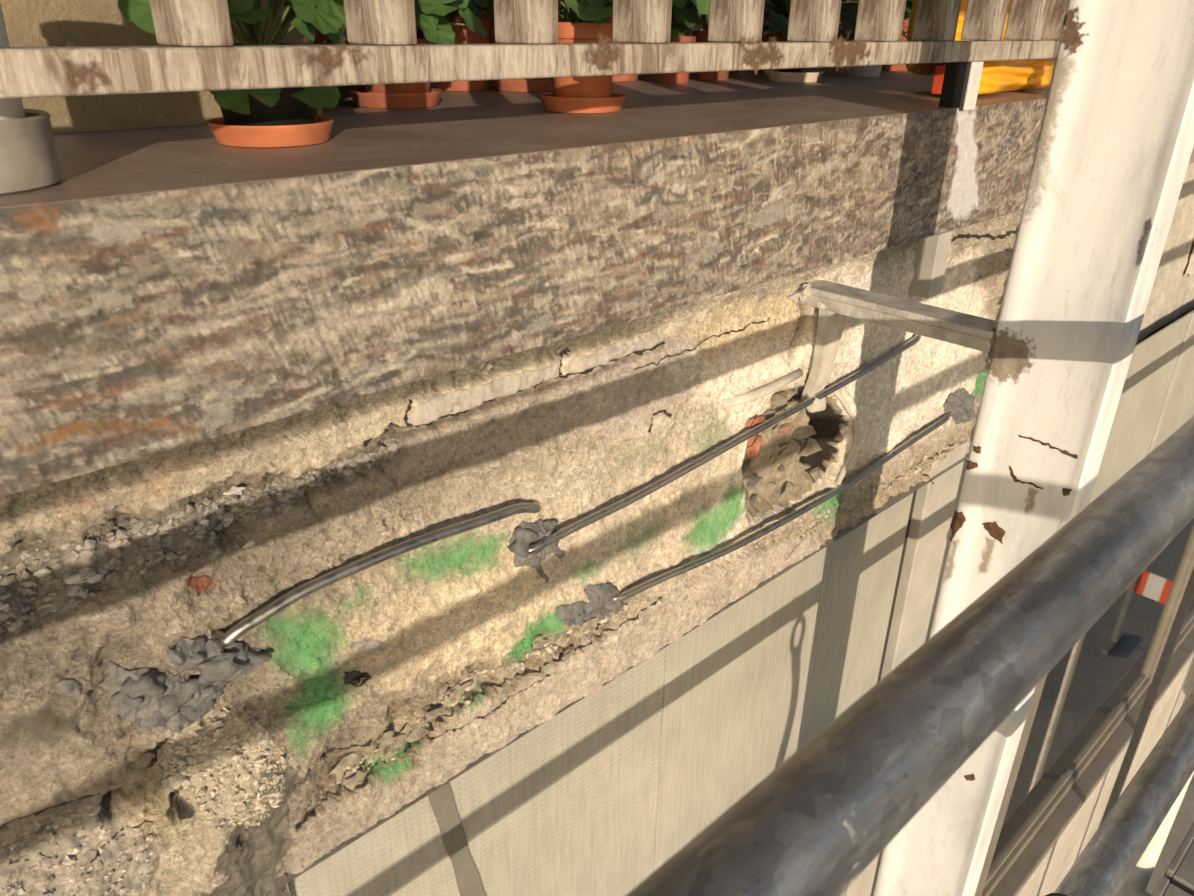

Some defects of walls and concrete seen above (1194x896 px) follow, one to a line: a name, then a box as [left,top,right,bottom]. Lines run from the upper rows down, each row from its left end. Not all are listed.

crack [951,229,1018,242]
peeling [71,289,134,317]
peeling [203,400,235,432]
peeling [530,314,552,334]
crack [364,317,770,447]
spalling [0,437,406,633]
spalling [211,500,541,647]
spalling [328,331,981,791]
corrosion [980,539,993,572]
crack [296,596,663,828]
spalling [159,707,289,851]